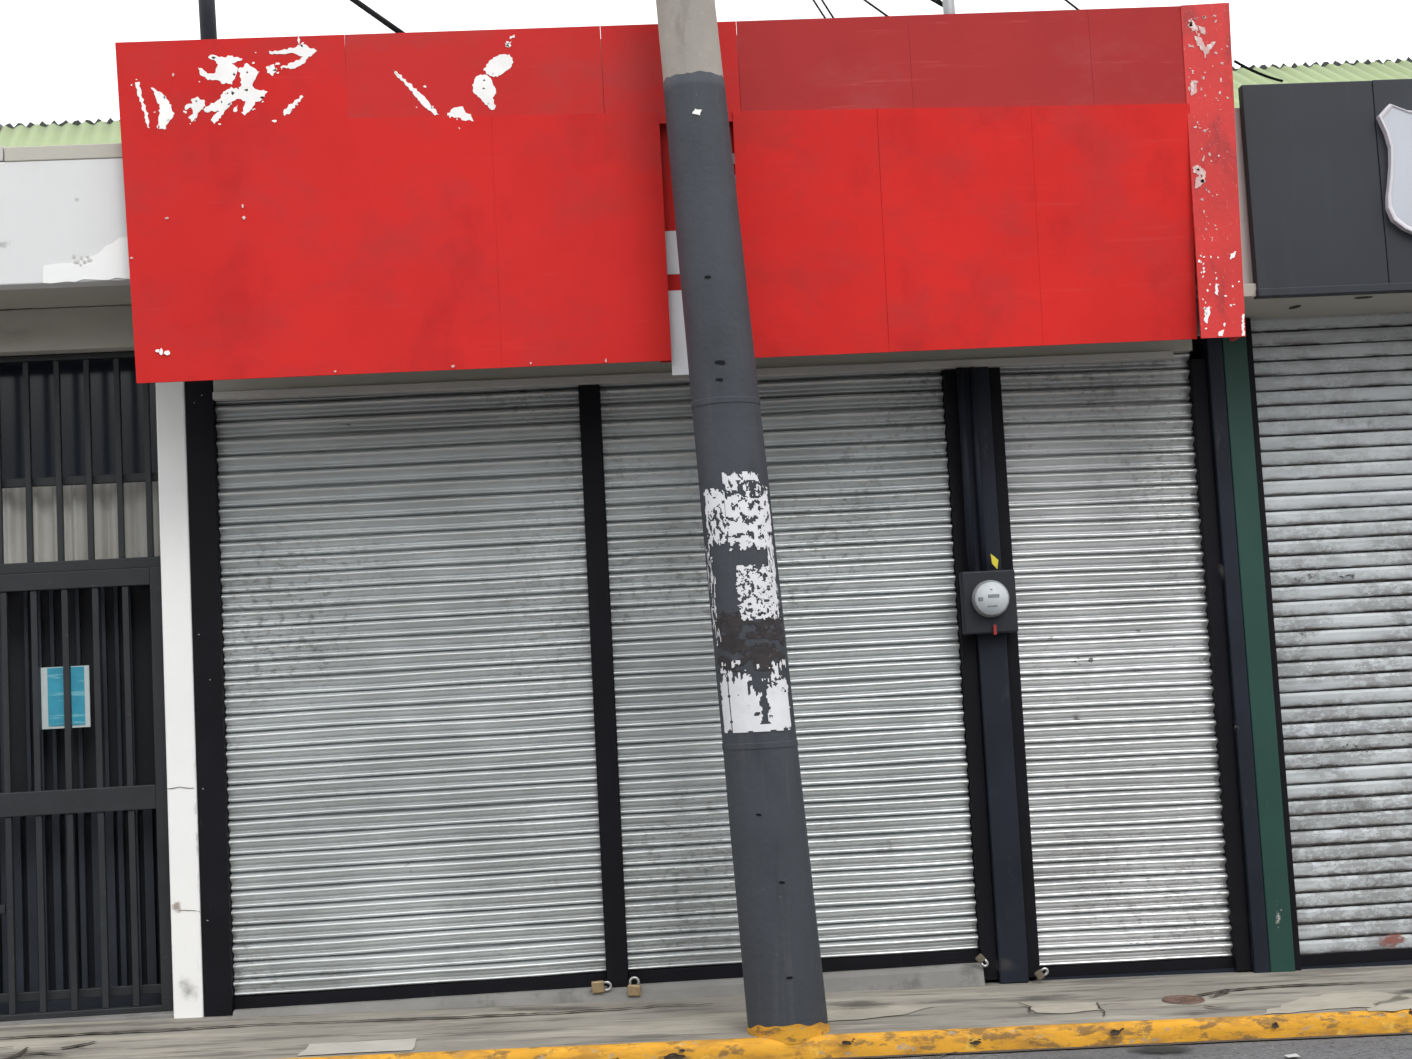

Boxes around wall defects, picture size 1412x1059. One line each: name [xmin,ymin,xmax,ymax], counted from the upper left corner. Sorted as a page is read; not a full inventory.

peeling [131,36,316,129]
peeling [393,70,473,129]
peeling [472,35,515,110]
peeling [1188,15,1229,110]
peeling [1193,121,1245,336]
spalling [664,1049,685,1059]